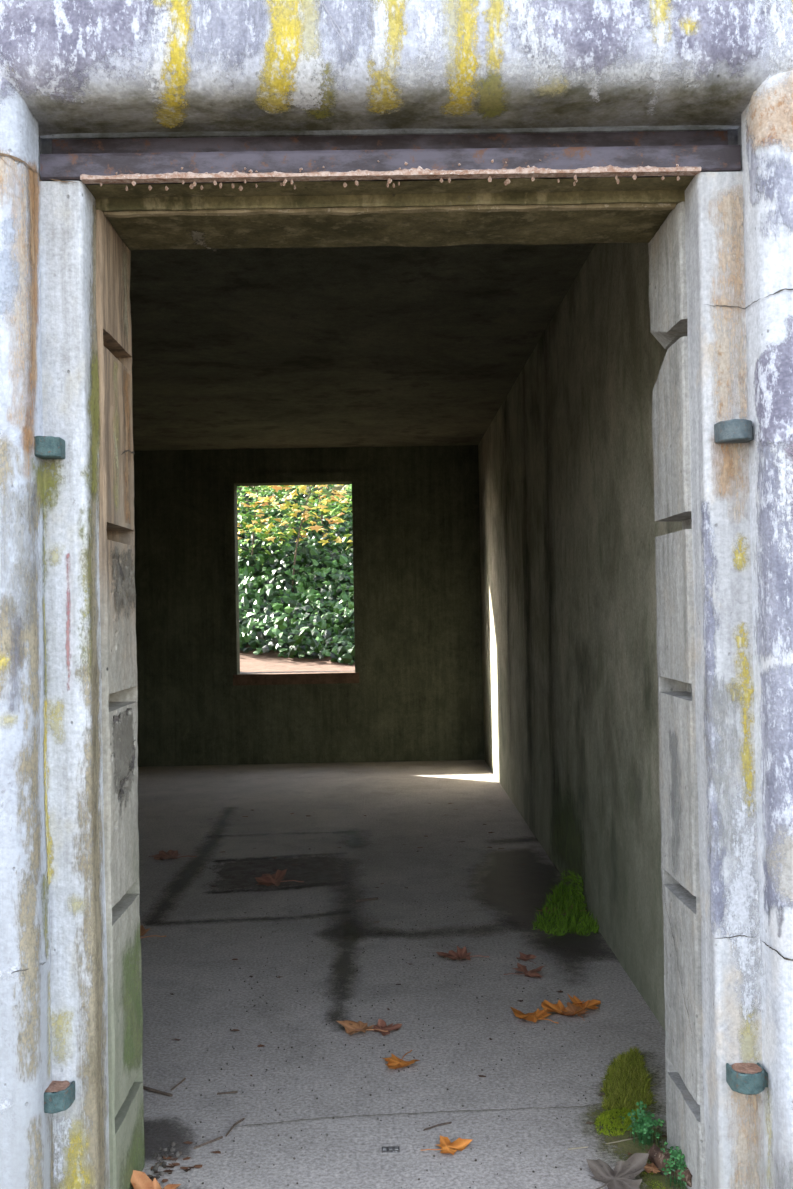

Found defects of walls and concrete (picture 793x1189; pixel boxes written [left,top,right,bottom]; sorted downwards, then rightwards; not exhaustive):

rust [746,71,793,151]
crack [705,288,793,309]
damp [145,808,616,1024]
crack [715,935,793,961]